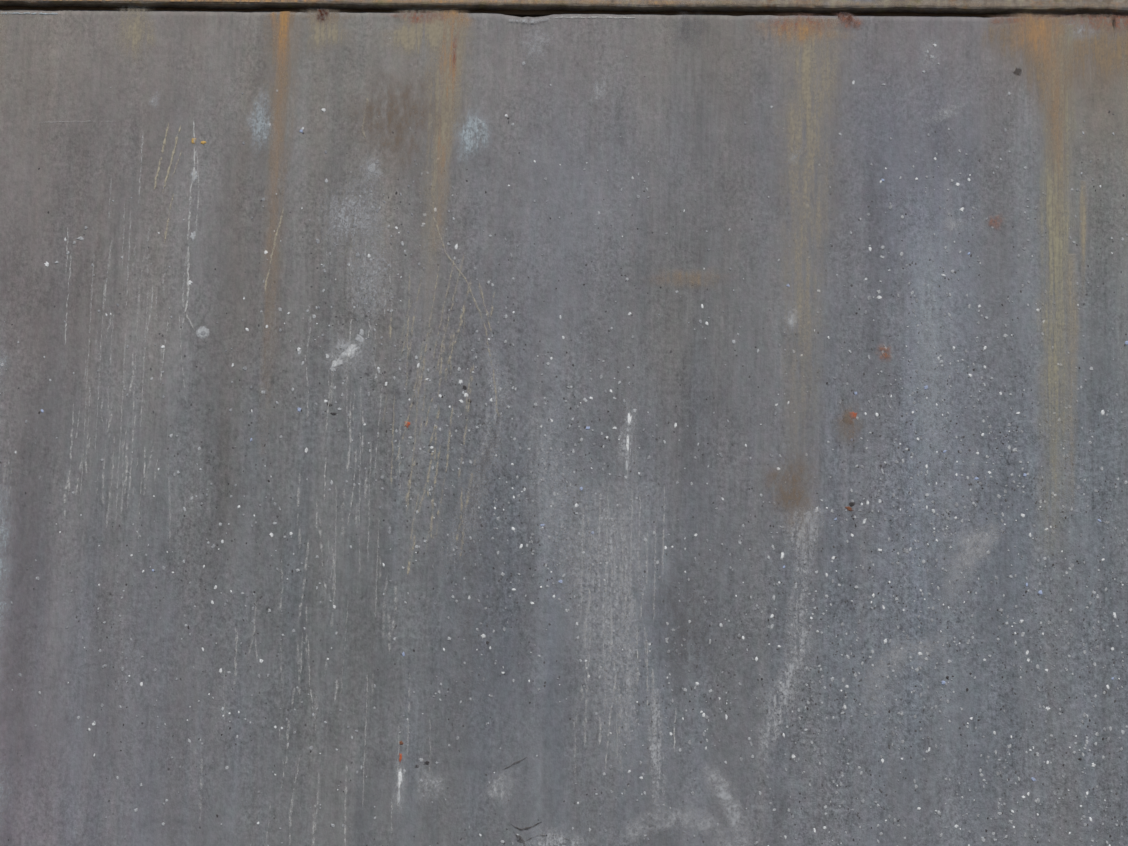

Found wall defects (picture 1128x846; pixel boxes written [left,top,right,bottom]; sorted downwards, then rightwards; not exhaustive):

rust [393,0,468,210]
rust [974,3,1128,79]